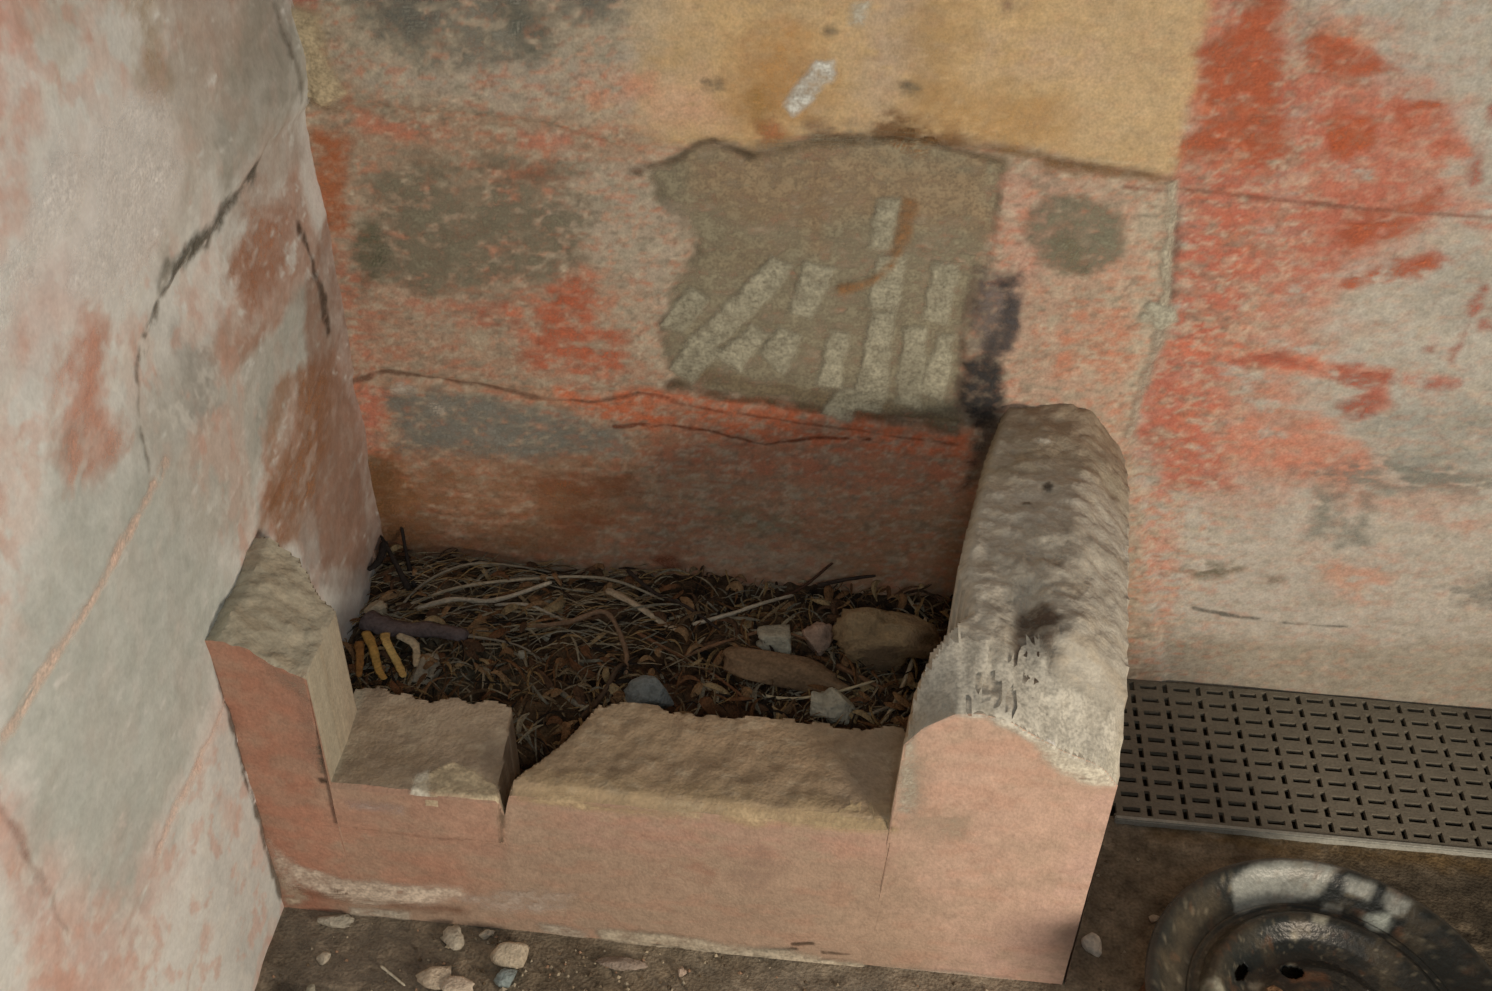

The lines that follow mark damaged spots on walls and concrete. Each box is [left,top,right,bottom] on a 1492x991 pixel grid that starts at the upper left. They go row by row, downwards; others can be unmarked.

crack [143,164,257,338]
crack [298,224,330,334]
spalling [636,137,1007,432]
crack [353,370,525,395]
crack [581,392,871,443]